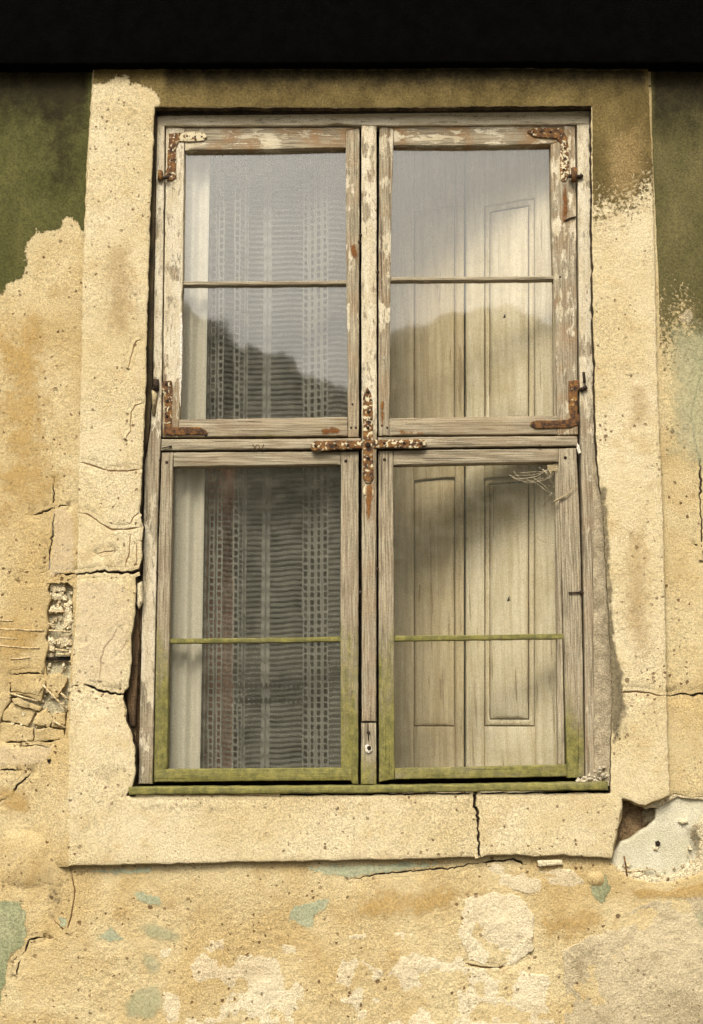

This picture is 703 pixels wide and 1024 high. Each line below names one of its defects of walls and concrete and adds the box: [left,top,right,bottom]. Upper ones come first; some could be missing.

peeling [0,68,703,376]
crack [17,459,142,585]
flaking render [0,582,74,743]
crack [620,687,703,700]
crack [348,791,557,883]
flaking render [336,794,703,1024]